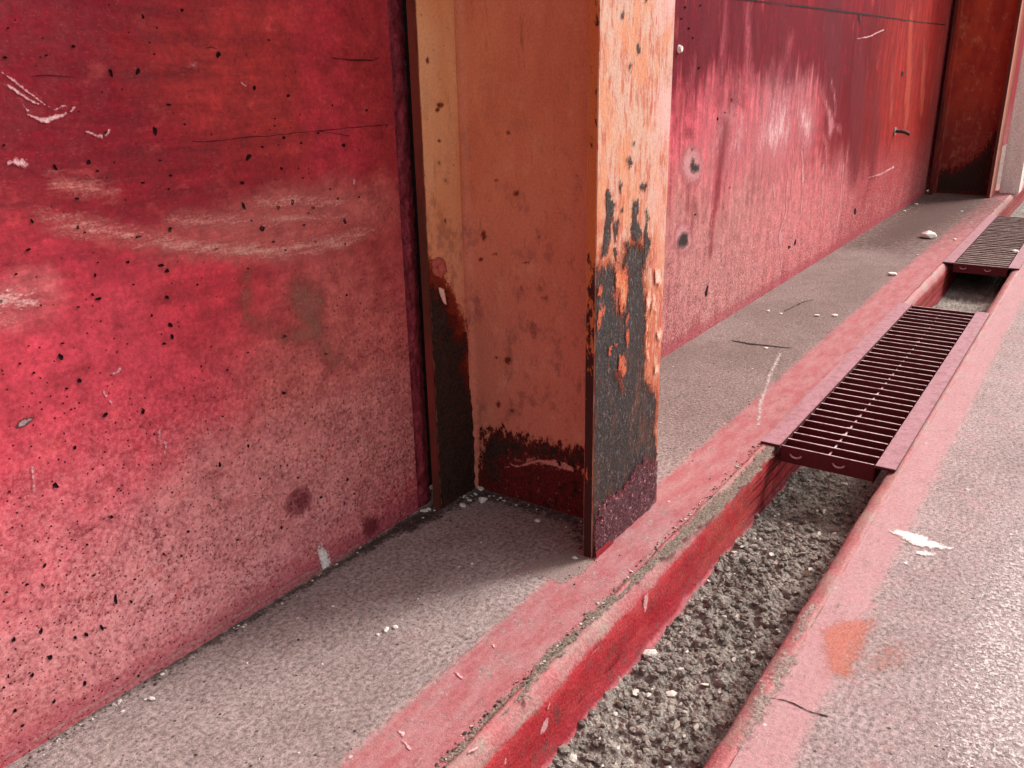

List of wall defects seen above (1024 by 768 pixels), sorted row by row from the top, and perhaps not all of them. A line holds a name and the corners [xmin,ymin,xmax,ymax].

crack [192,125,382,142]
leakage [702,0,842,268]
corrosion [428,238,659,556]
peeling [890,487,1024,768]